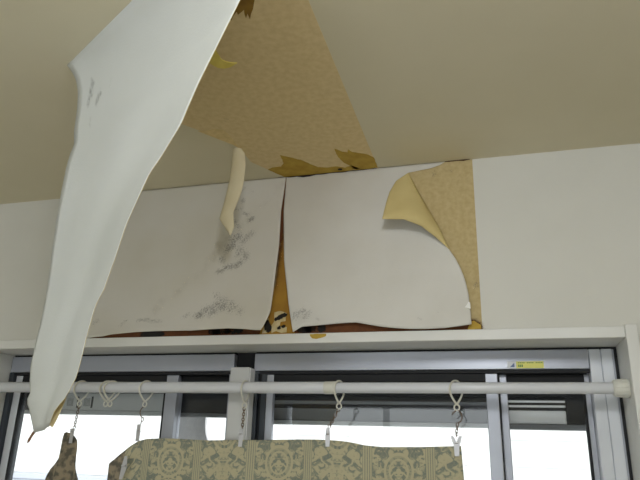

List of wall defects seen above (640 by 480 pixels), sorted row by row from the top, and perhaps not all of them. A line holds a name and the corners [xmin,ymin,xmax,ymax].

peeling [182,0,378,236]
peeling [260,234,295,334]
peeling [409,159,482,330]